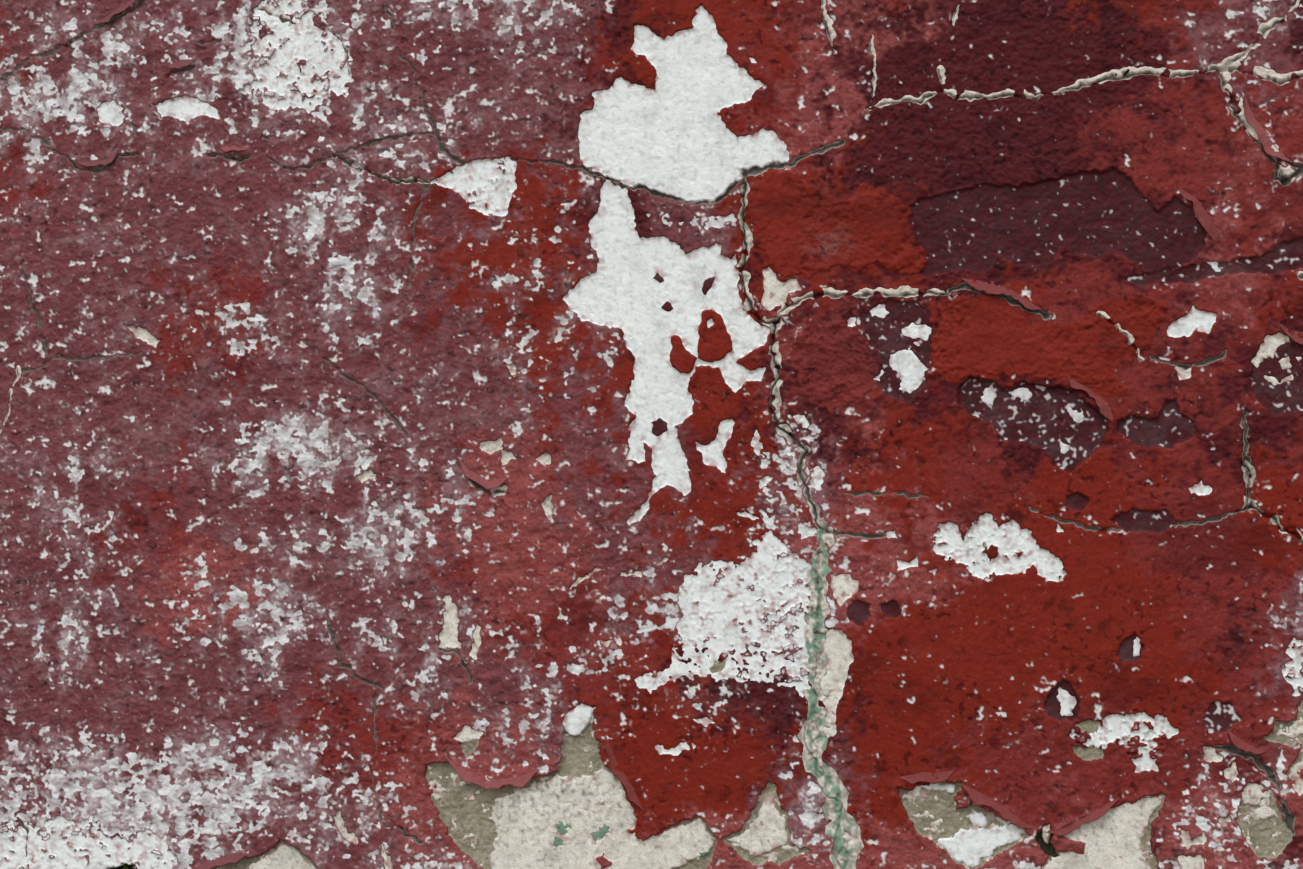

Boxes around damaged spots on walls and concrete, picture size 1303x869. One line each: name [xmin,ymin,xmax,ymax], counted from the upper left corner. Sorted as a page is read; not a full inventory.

peeling [0,0,579,348]
crack [209,0,465,315]
peeling [490,258,553,382]
crack [821,0,837,55]
peeling [548,6,1303,525]
crack [867,0,1303,186]
crack [1096,311,1227,370]
spalling [0,399,901,869]
crack [510,139,1052,869]
peeling [897,513,1067,582]
spalling [899,605,1303,869]
crack [1173,411,1303,544]